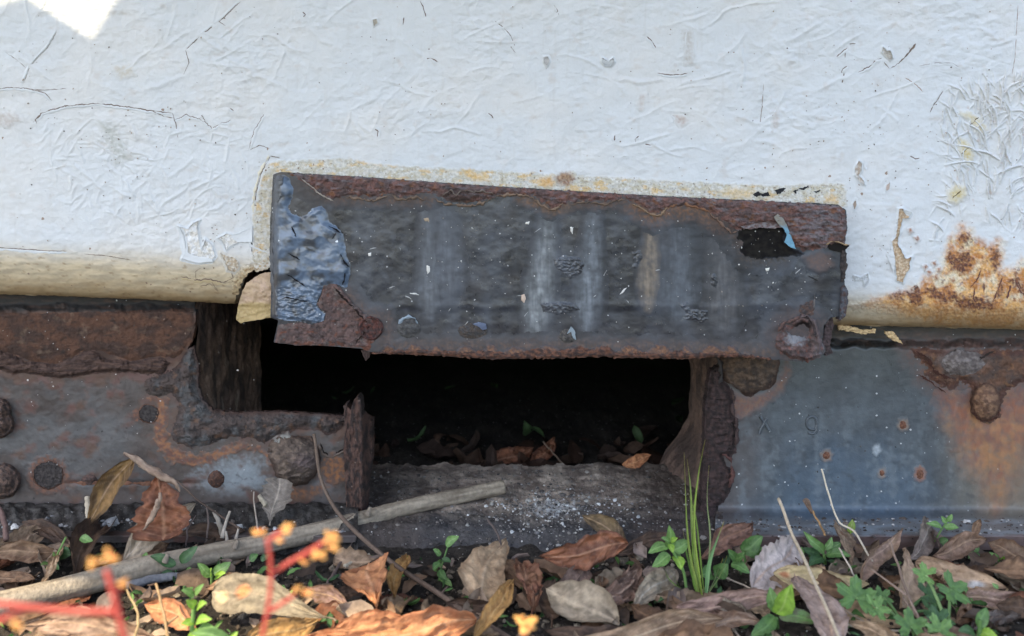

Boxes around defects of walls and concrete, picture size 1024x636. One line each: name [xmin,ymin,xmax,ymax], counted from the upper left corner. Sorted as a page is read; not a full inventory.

crack [0,30,279,292]
peeling [175,156,868,277]
peeling [886,205,916,286]
corrosion [0,308,345,496]
corrosion [275,172,1024,530]